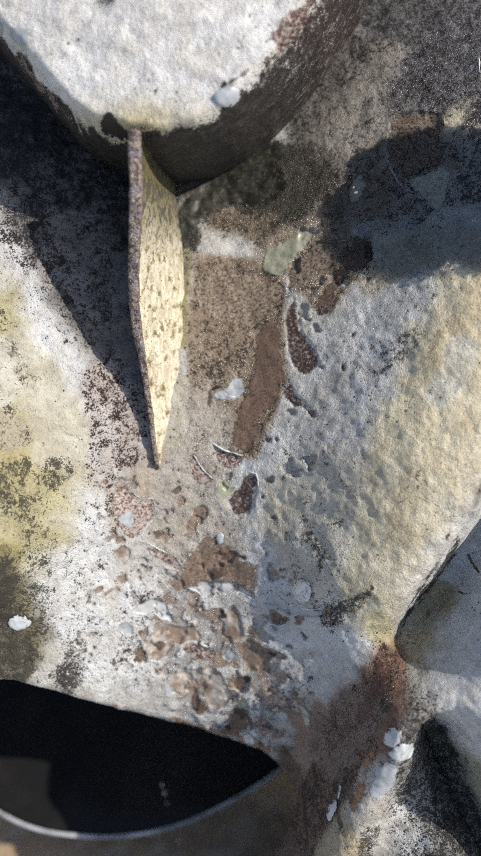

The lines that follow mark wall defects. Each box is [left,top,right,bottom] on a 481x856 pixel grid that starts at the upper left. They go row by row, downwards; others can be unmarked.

leakage [175,136,286,251]
peeling [195,238,349,375]
peeling [111,488,183,568]
spalling [193,505,208,520]
peeling [281,579,320,610]
leakage [48,645,89,695]
peeling [118,591,310,728]
peeling [244,719,272,744]
rust [348,738,376,813]